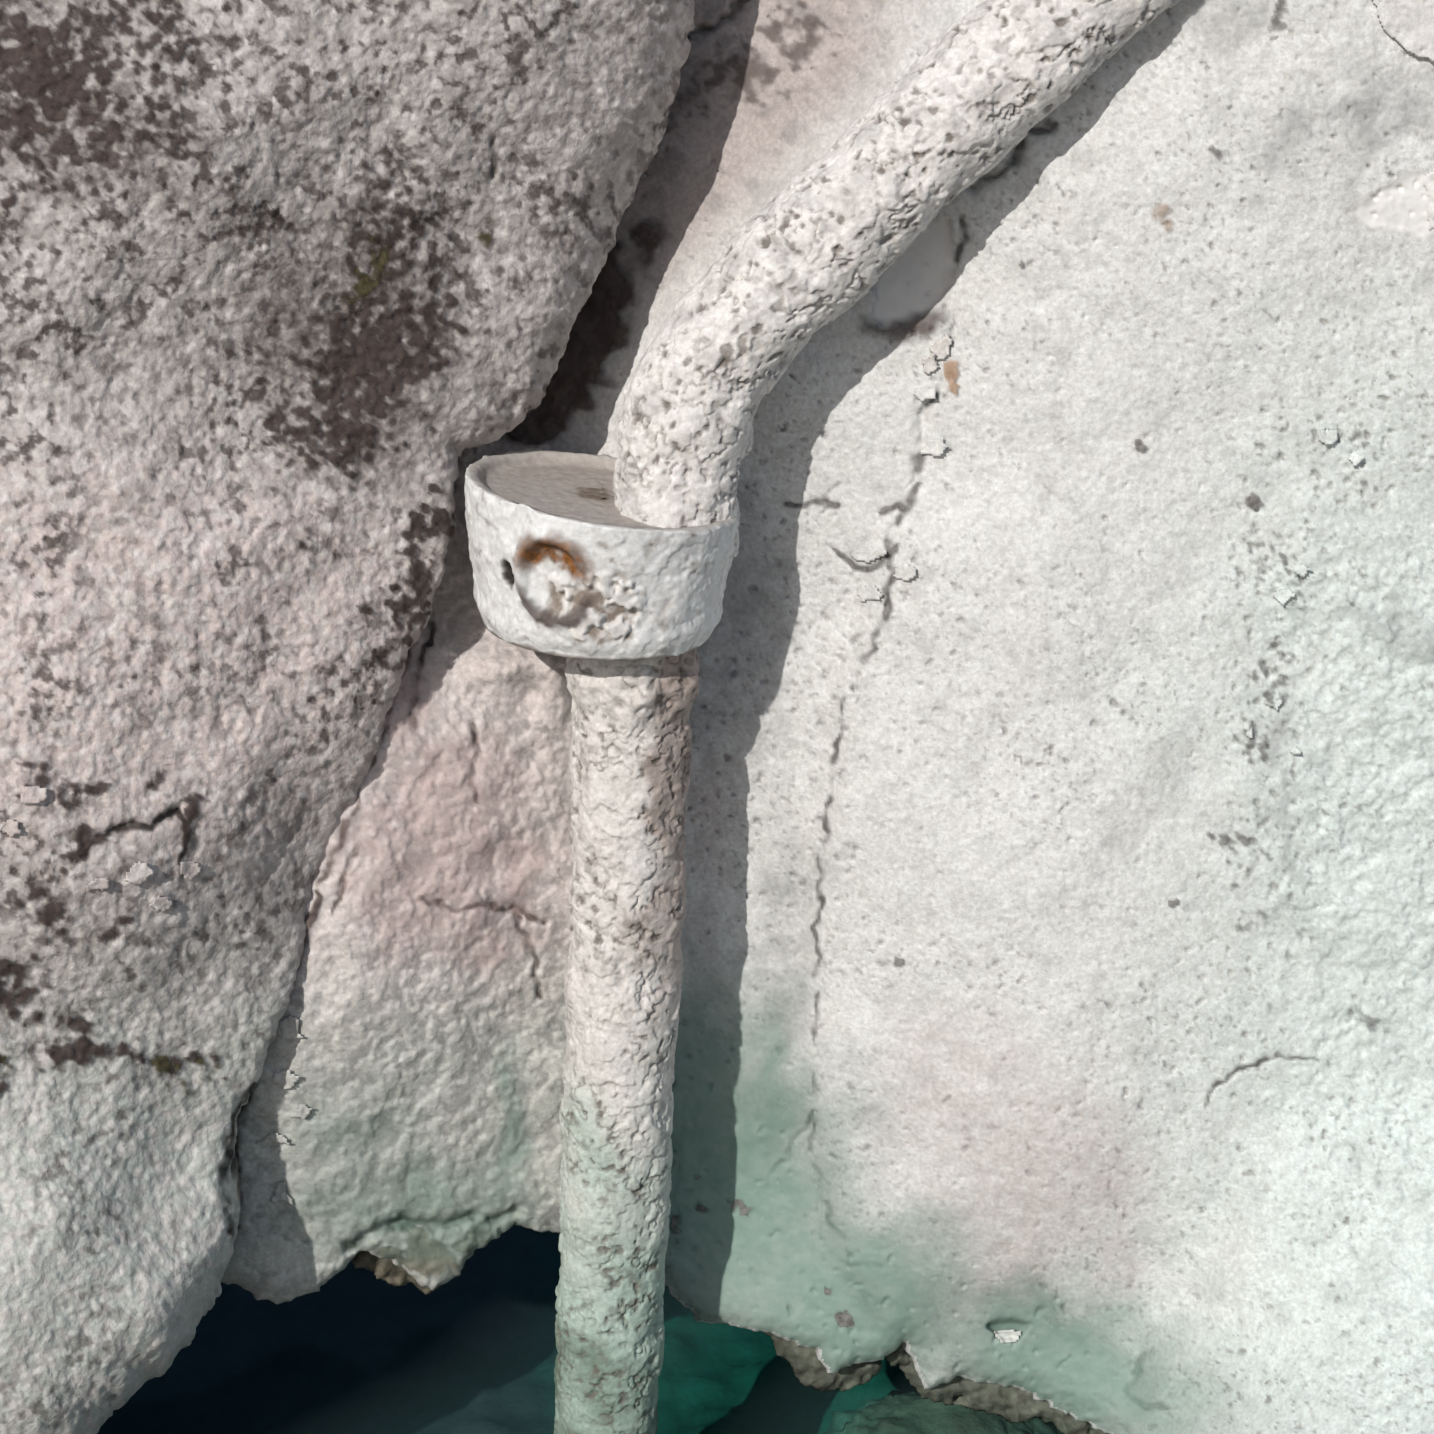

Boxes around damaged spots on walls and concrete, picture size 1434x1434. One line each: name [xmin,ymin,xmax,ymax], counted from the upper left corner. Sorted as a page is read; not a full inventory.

mould [0,0,221,242]
spalling [1351,169,1434,241]
mould [223,146,468,504]
mould [337,483,455,674]
rust [517,539,586,577]
rust [518,589,589,627]
crack [832,454,924,654]
water stain [0,761,227,1095]
crack [76,808,191,865]
crack [811,797,832,1033]
spalling [764,1332,1108,1434]
spalling [994,1330,1021,1343]